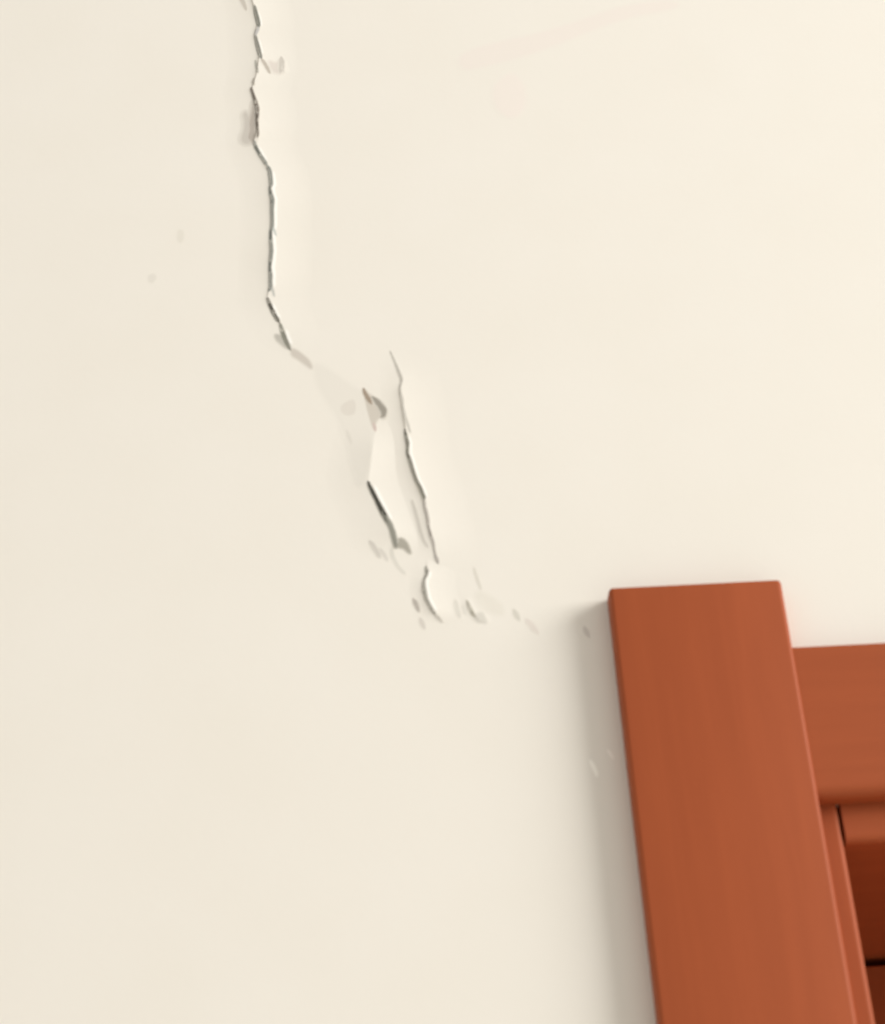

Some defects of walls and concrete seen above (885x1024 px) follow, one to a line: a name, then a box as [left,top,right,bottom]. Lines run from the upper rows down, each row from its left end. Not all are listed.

crack [239,0,292,351]
spalling [392,537,412,555]
crack [362,351,443,623]